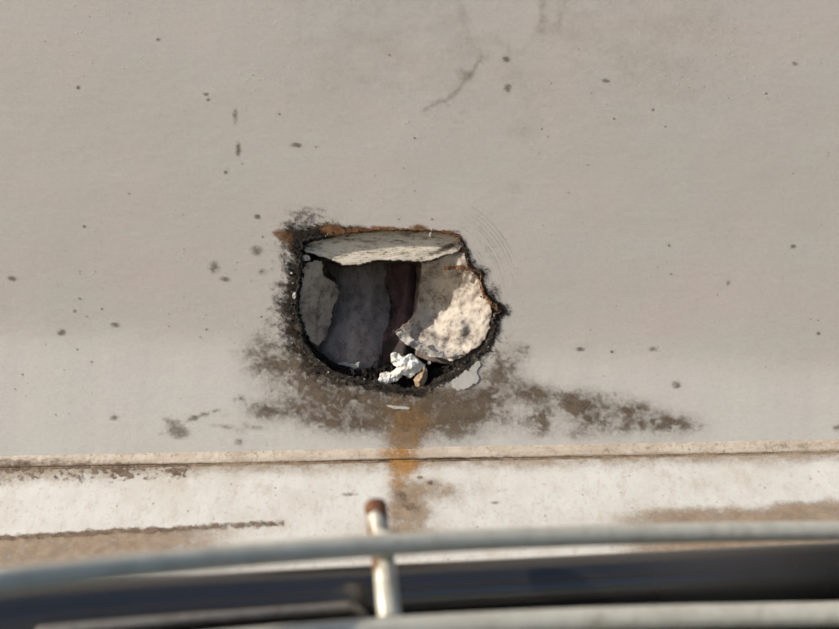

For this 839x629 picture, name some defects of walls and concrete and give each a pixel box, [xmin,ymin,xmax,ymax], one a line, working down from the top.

corrosion [320,224,398,235]
water stain [259,325,549,436]
peeling [451,361,480,391]
water stain [560,393,609,425]
water stain [620,406,688,430]
corrosion [384,408,428,483]